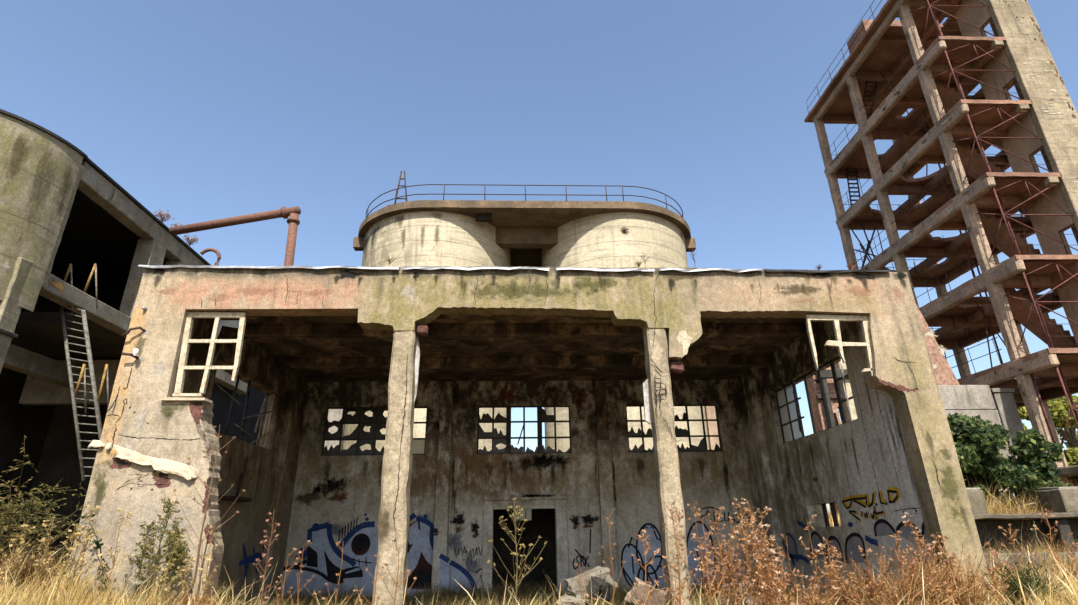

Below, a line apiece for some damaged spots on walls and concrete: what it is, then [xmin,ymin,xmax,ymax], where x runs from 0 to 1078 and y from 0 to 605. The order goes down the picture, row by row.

leakage [472,275,616,298]
crack [107,367,201,447]
spalling [189,401,212,463]
peeling [654,330,692,414]
peeling [88,440,215,544]
leakage [942,450,958,515]